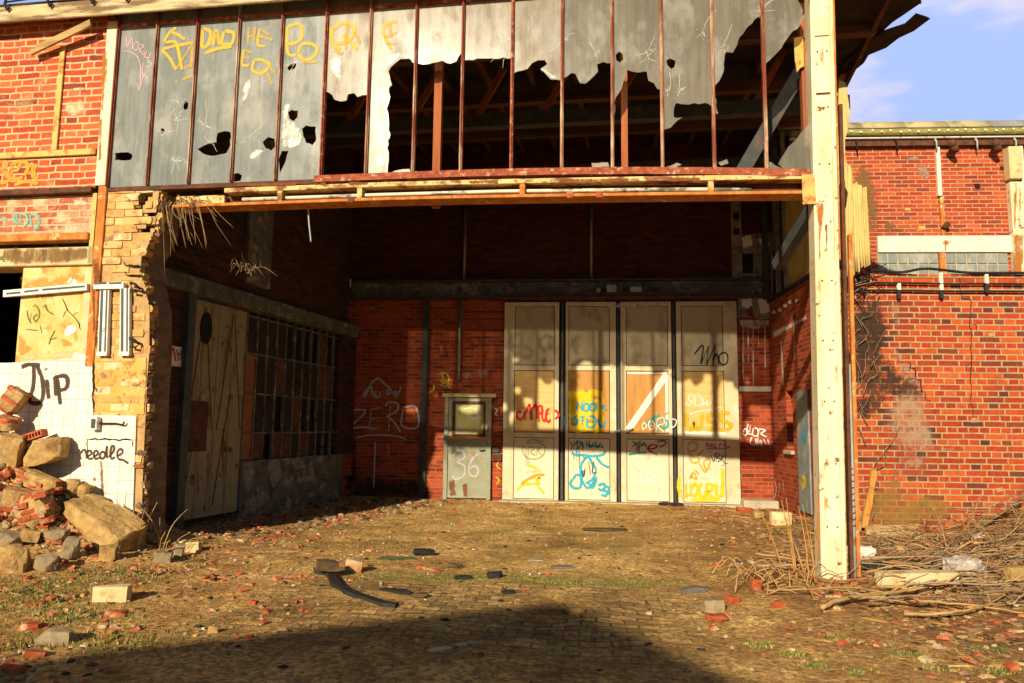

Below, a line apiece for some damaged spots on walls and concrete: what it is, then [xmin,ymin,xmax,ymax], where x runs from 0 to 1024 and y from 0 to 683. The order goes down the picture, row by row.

rust [817,0,841,261]